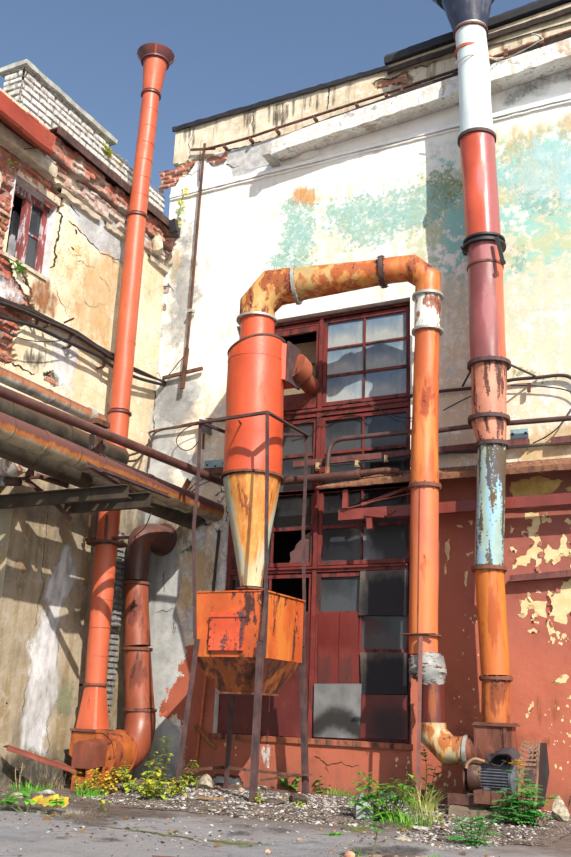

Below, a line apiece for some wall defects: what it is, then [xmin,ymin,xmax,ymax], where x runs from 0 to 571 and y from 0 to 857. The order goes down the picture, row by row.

water stain [268,98,318,127]
flaking render [0,147,61,364]
crack [50,197,119,311]
crack [24,276,35,310]
peeling [510,512,571,573]
peeling [518,579,571,645]
water stain [1,544,76,786]